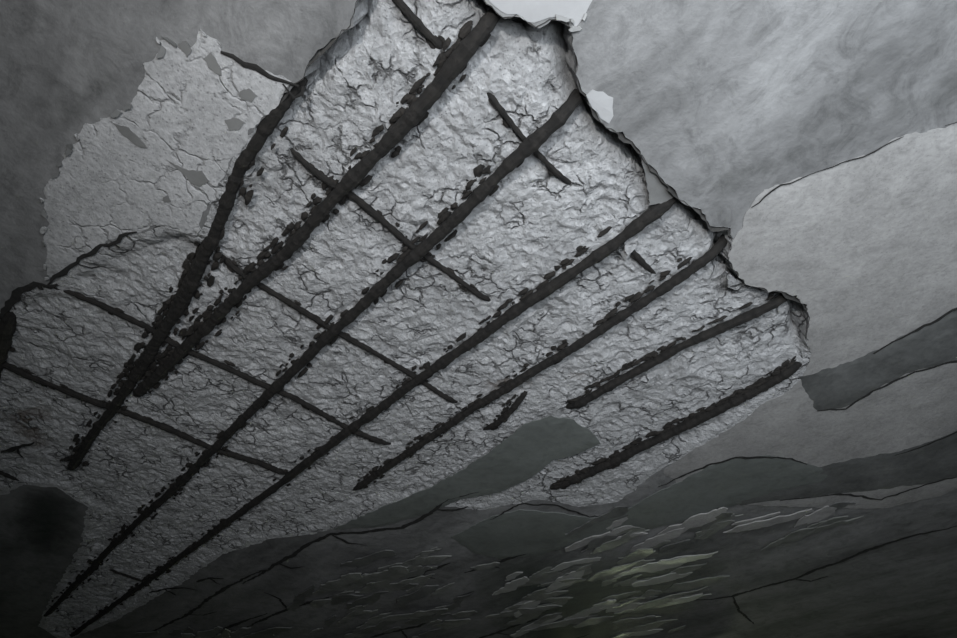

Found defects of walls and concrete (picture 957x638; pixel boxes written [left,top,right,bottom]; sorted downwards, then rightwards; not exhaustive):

peeling [489,0,592,32]
peeling [2,29,295,471]
spalling [133,0,501,397]
peeling [728,122,957,376]
spalling [43,89,728,638]
spalling [550,356,802,490]
spalling [565,291,788,409]
peeling [664,363,957,483]
crack [149,492,479,631]
crack [407,554,525,579]
peeling [485,478,957,638]
crack [693,526,956,624]